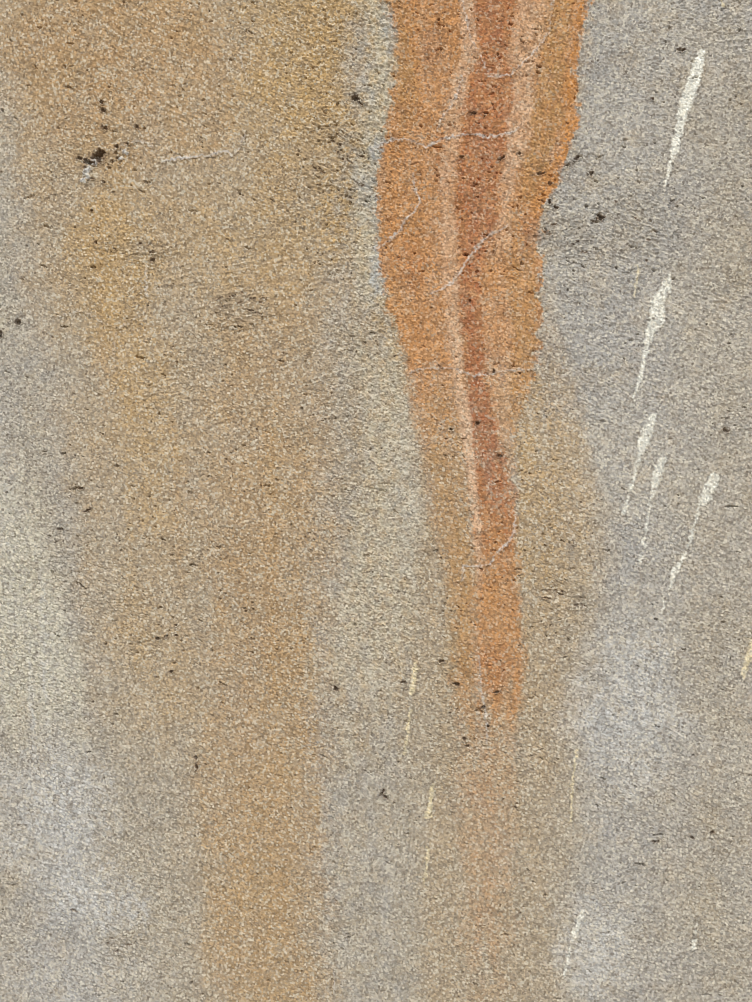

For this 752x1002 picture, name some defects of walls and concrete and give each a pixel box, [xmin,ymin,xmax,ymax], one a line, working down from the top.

corrosion [371,0,624,1002]